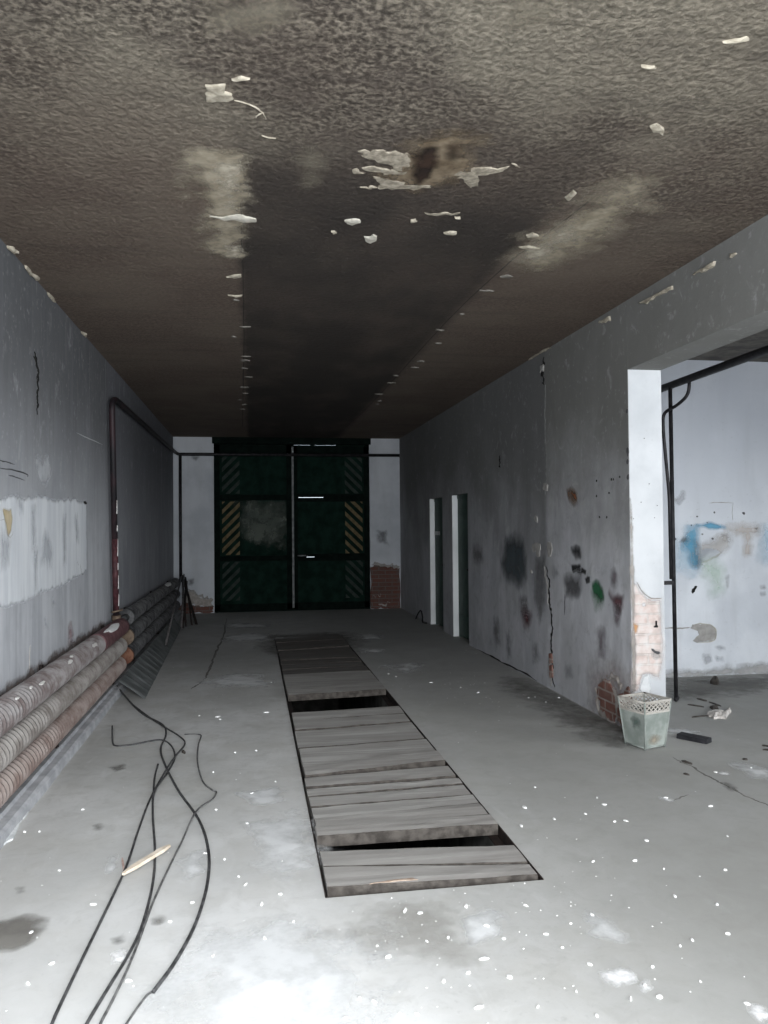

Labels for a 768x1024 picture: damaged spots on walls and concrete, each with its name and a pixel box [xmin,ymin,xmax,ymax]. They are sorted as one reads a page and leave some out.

peeling [205,76,250,103]
spalling [352,131,519,191]
leakage [183,149,249,258]
spalling [410,212,461,235]
leakage [528,178,644,269]
crack [32,352,40,415]
crack [539,357,547,495]
flaking render [370,562,401,609]
peeling [595,583,663,726]
spalling [691,623,717,643]
crack [674,758,768,805]
leakage [0,917,41,950]